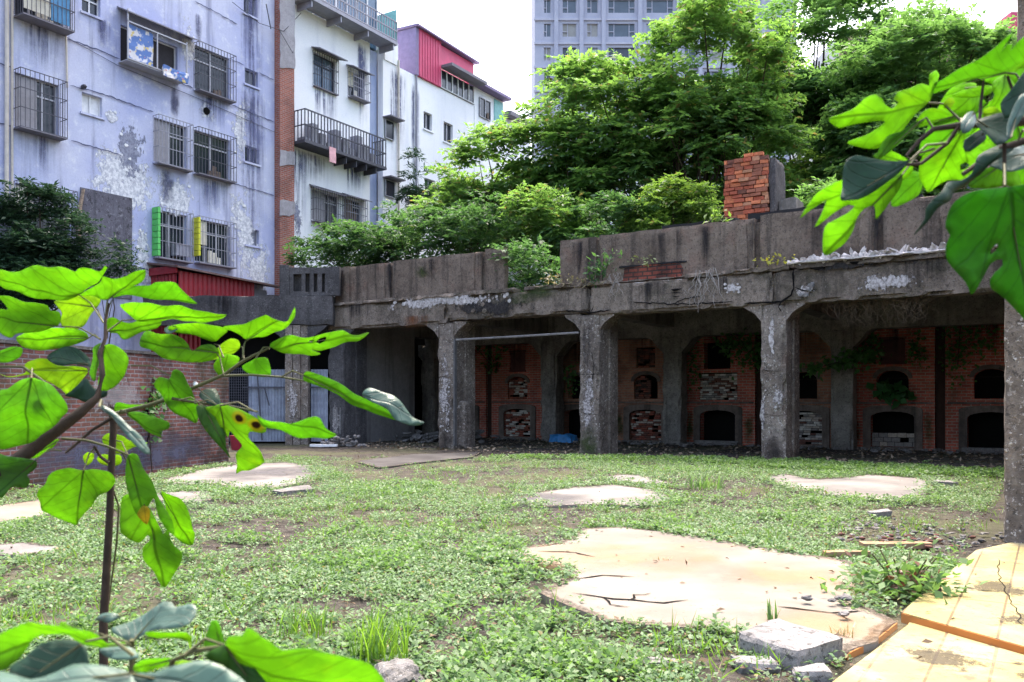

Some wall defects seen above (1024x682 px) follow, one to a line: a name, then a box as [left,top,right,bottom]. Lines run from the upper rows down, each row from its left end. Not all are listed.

damp [245,0,258,58]
damp [245,96,260,170]
peeling [90,110,199,286]
peeling [787,242,947,297]
flaking render [388,292,534,315]